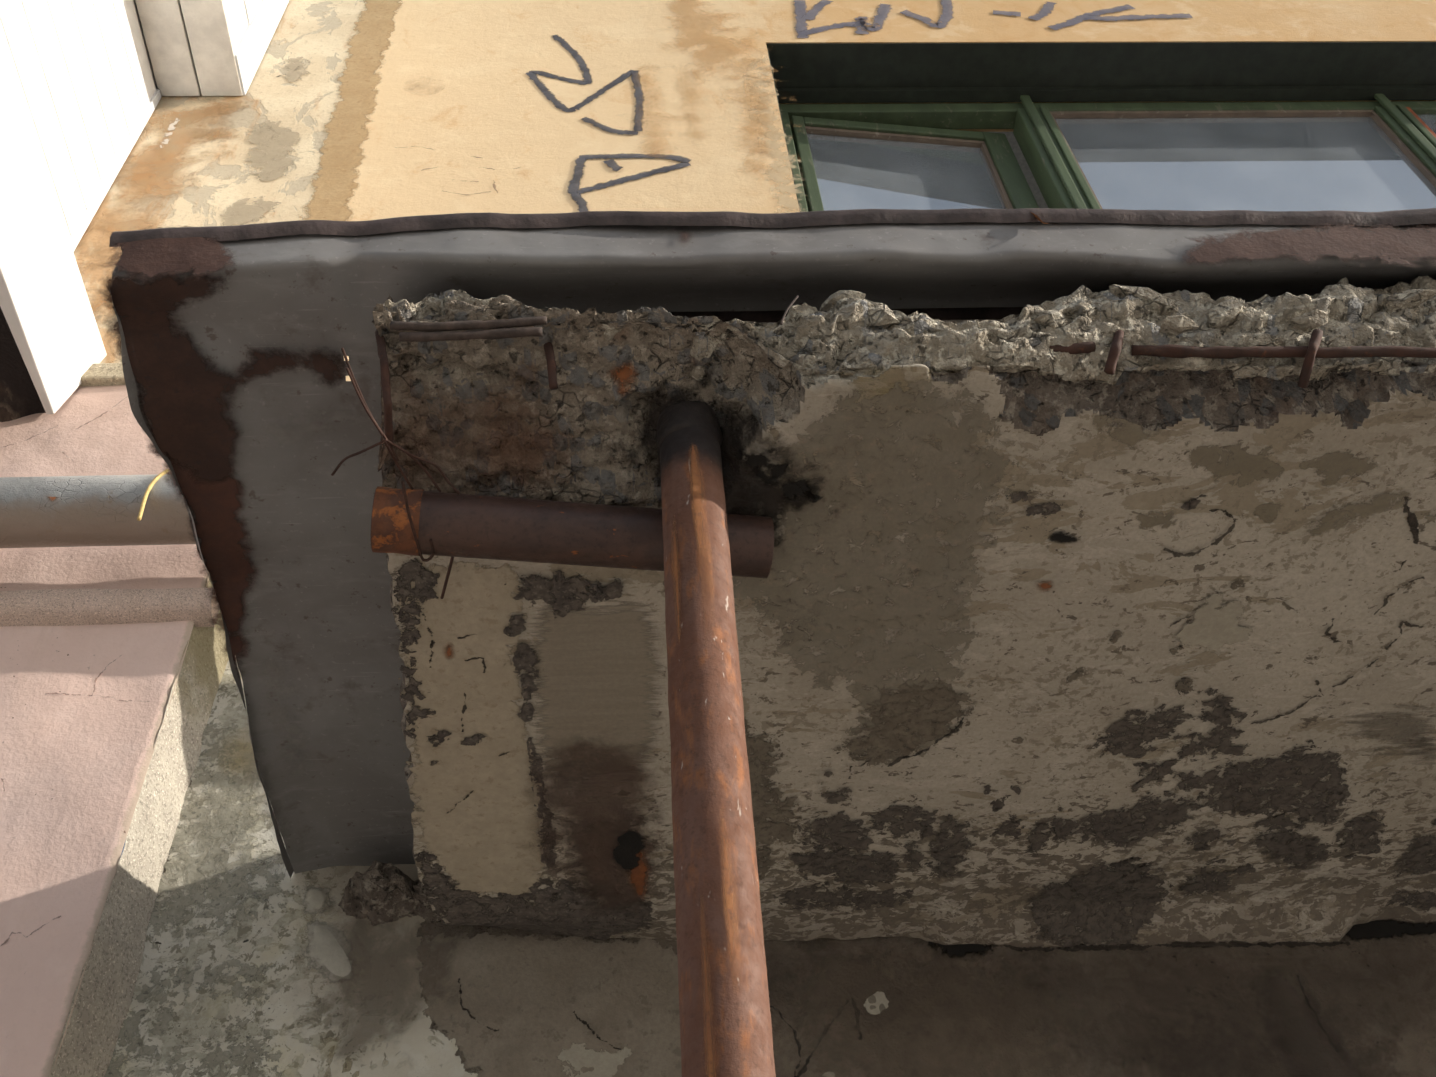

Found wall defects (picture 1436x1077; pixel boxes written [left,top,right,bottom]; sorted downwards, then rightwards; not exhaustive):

peeling [220,120,299,226]
rust [1183,223,1436,267]
rust [91,102,345,669]
rust [690,445,713,595]
spalling [372,275,1436,780]
crack [1163,494,1236,557]
crack [1251,496,1425,724]
peeling [338,851,682,1077]
spalling [611,830,645,870]
rust [722,817,736,966]
crack [770,997,863,1077]
peeling [744,678,1436,949]